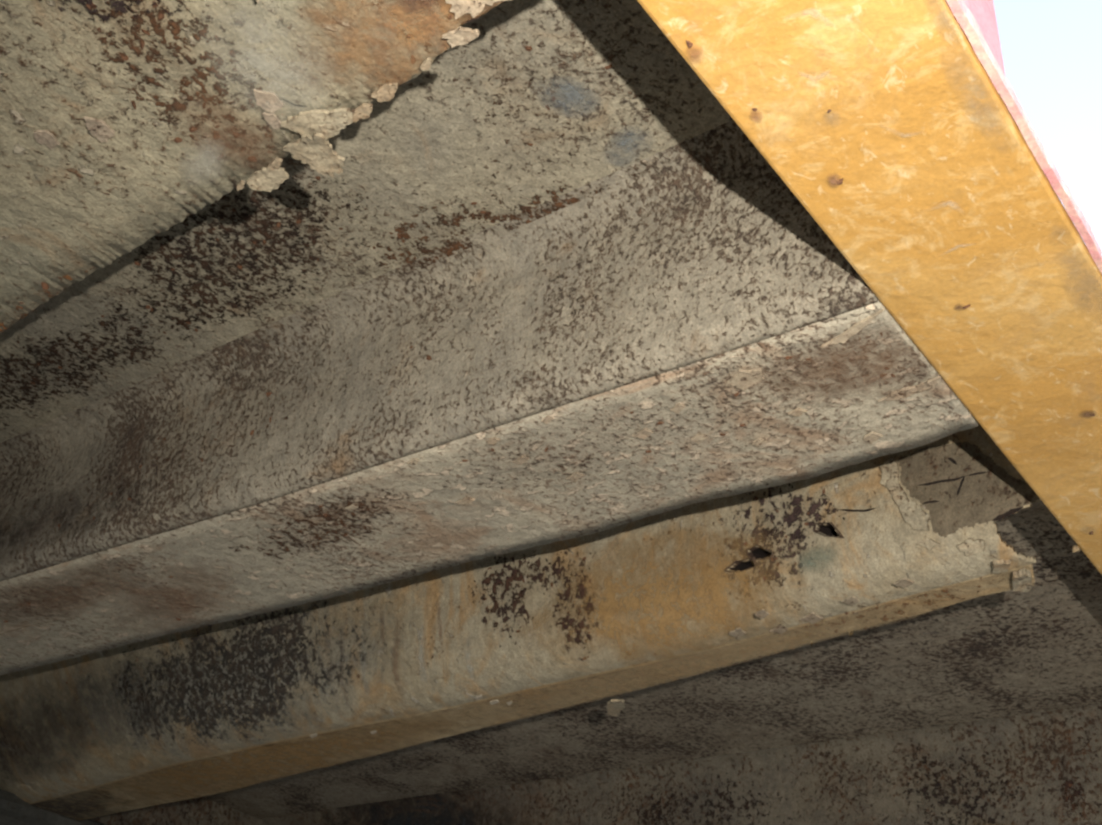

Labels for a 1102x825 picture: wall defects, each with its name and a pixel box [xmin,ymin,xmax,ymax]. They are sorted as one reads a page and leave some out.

rust [59,0,284,162]
rust [333,0,455,72]
peeling [420,57,432,71]
peeling [442,0,507,48]
peeling [236,82,398,192]
rust [0,65,620,429]
spalling [879,441,1040,538]
rust [459,549,601,661]
rust [720,482,846,610]
peeling [992,559,1032,592]
damp [43,615,356,742]